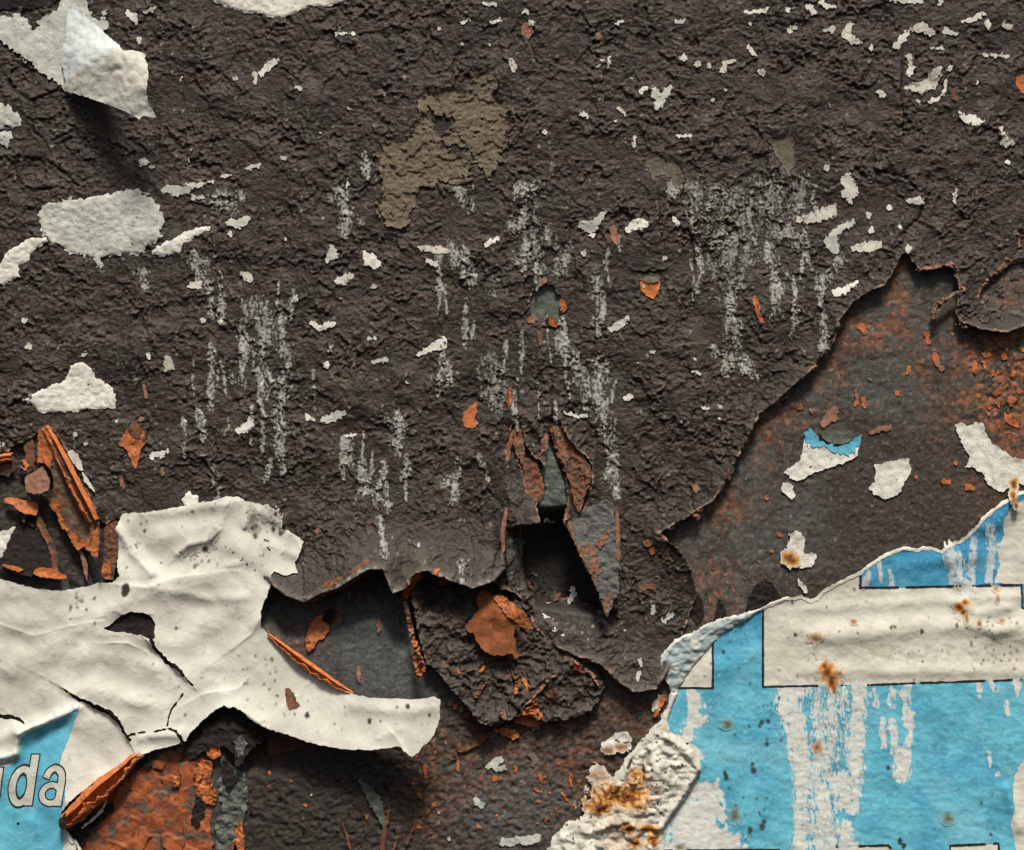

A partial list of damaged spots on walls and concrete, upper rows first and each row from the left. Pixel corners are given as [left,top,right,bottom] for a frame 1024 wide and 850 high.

damp [432,173,579,433]
damp [585,231,625,338]
damp [663,163,848,382]
peeling [0,425,118,583]
peeling [267,557,383,694]
damp [338,405,413,560]
peeling [462,401,479,428]
peeling [447,420,622,772]
damp [545,307,628,502]
corrosion [780,548,801,570]
corrosion [1008,476,1020,511]
corrosion [575,742,666,850]